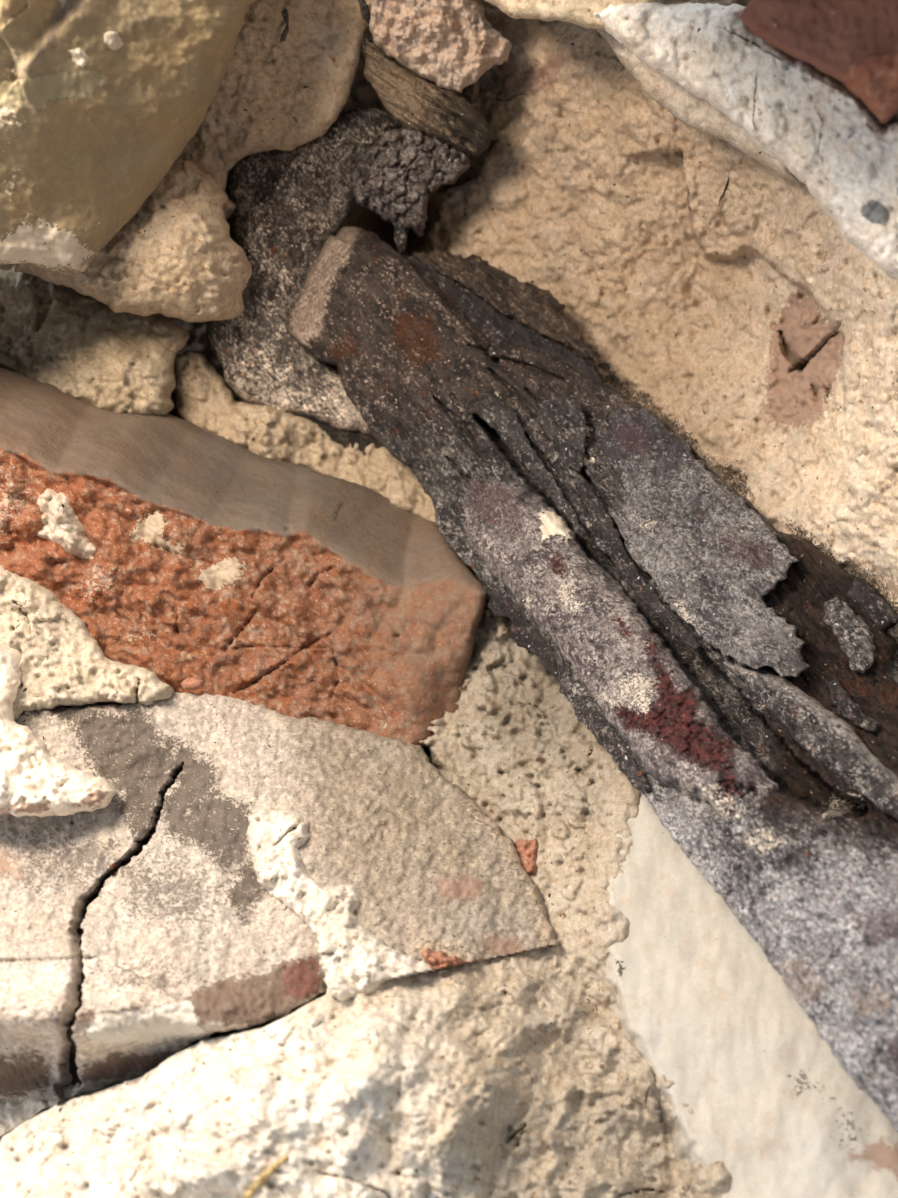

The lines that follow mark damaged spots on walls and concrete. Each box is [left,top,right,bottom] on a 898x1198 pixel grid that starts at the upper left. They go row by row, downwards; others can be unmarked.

corrosion [610,617,764,816]
crack [0,774,179,1139]